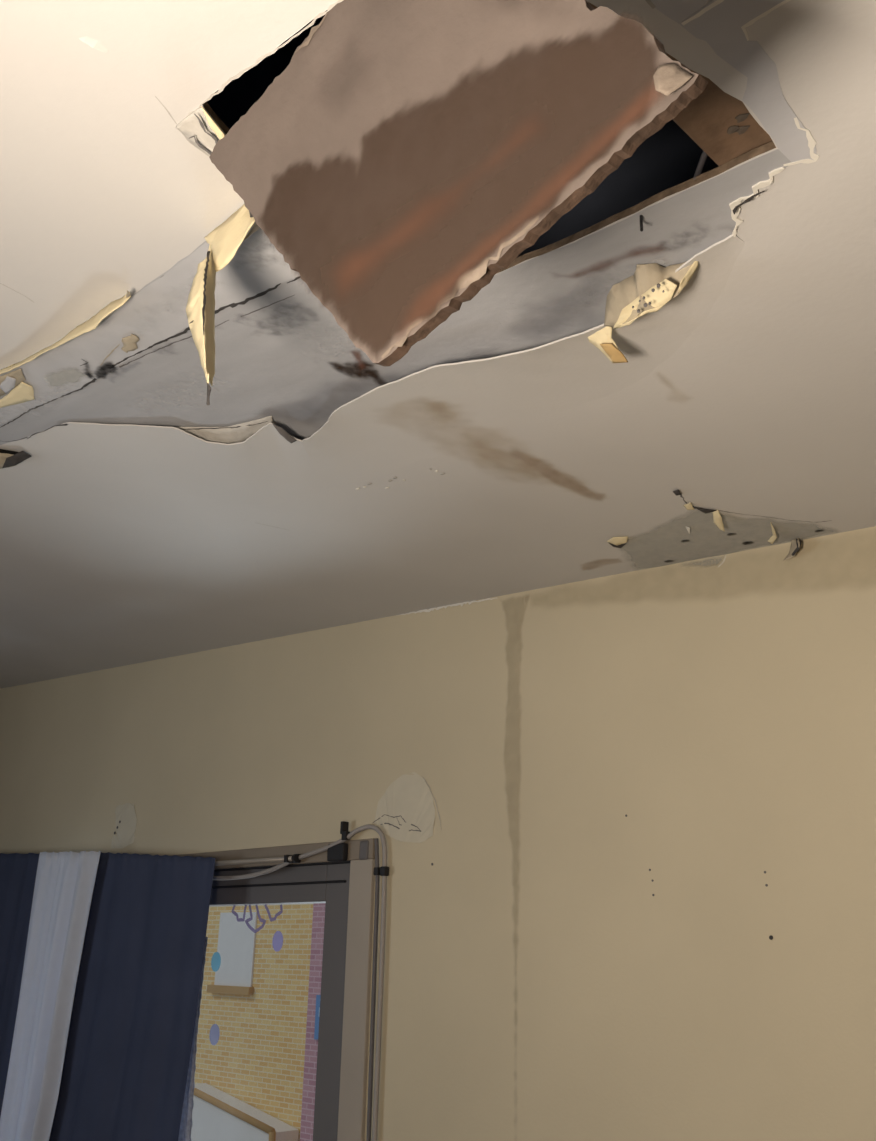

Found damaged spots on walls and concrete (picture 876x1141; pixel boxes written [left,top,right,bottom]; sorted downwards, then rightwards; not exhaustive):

peeling [186,0,343,117]
peeling [653,63,693,96]
damp [261,16,656,353]
peeling [0,149,791,469]
peeling [607,536,628,548]
peeling [712,510,753,545]
peeling [783,538,802,561]